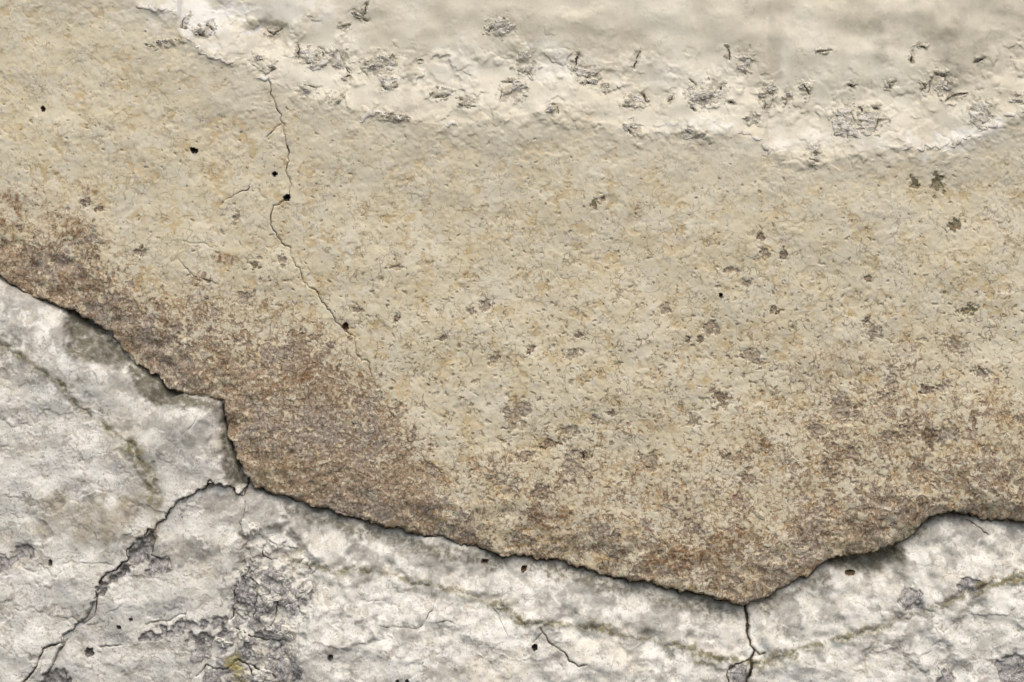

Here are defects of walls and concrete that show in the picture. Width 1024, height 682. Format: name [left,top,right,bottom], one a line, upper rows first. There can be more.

crack [270,83,371,370]
crack [0,275,114,339]
spalling [0,185,1024,605]
crack [23,409,763,682]
spalling [139,555,316,682]
spalling [897,587,923,610]
spalling [42,669,72,682]
spalling [936,669,954,682]
spalling [995,653,1024,682]